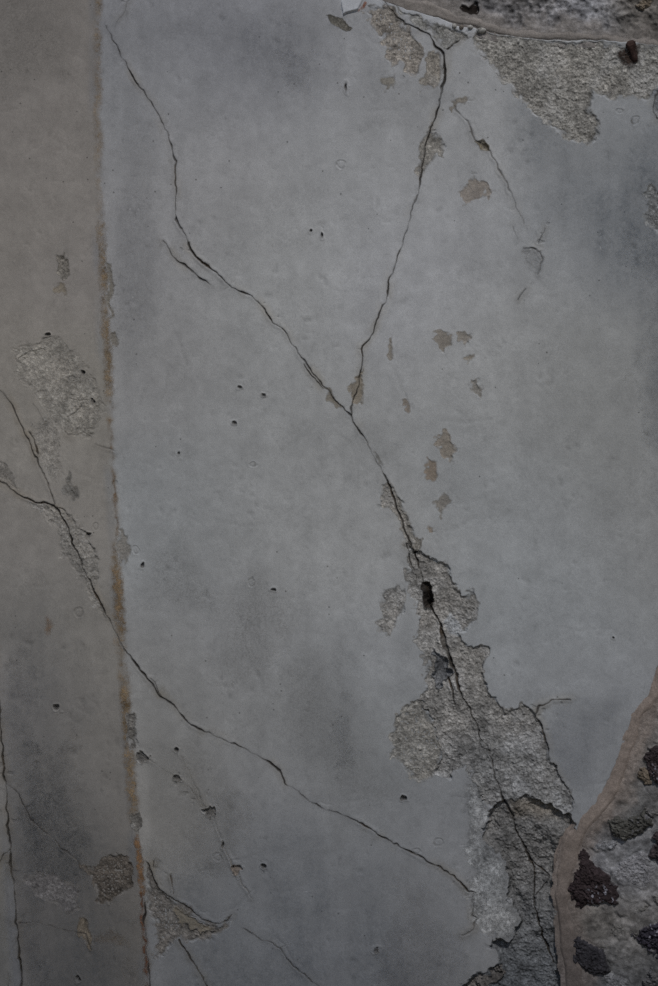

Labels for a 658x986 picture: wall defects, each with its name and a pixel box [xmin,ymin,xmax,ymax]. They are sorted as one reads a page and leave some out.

crack [393,12,457,184]
peeling [415,122,444,176]
spalling [327,0,658,143]
crack [169,242,212,281]
crack [304,250,400,435]
crack [0,481,111,622]
crack [384,475,419,567]
peeling [424,429,455,481]
crack [430,595,482,740]
spalling [375,483,576,986]
spalling [78,855,133,904]
spalling [146,868,228,956]